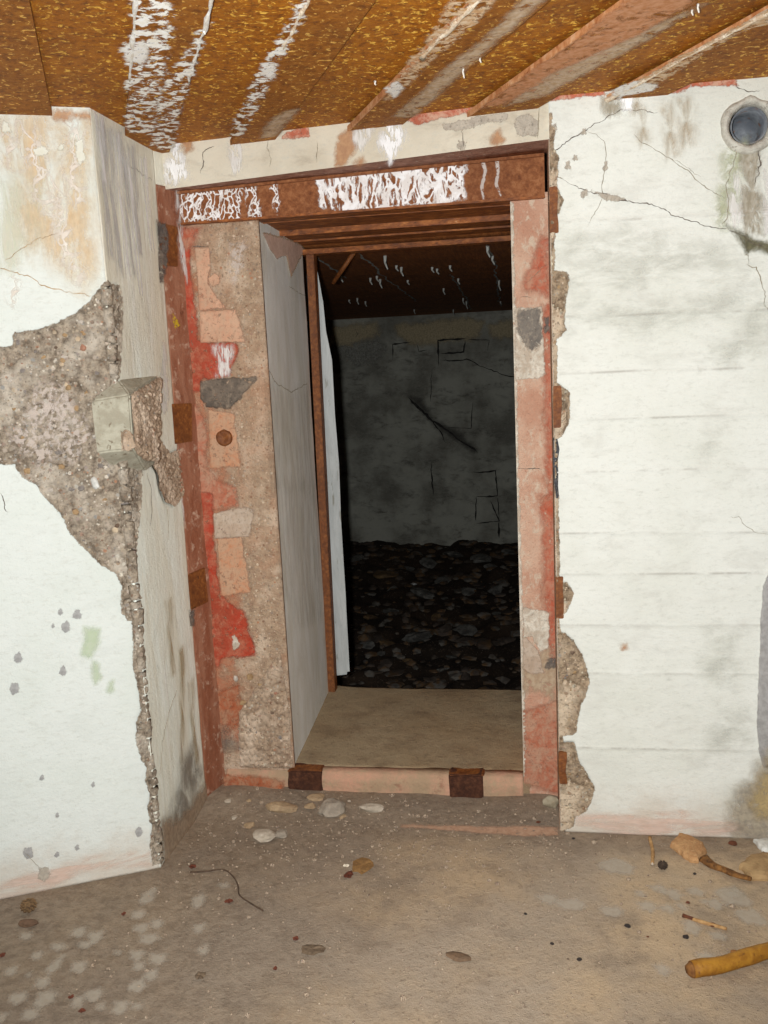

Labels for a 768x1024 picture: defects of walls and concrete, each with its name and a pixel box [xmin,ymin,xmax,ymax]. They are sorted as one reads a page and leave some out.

corrosion [54,111,91,120]
water stain [95,0,262,294]
water stain [229,0,310,174]
peeling [282,127,310,139]
corrosion [335,130,363,166]
crack [537,109,768,309]
water stain [729,152,768,253]
peeling [329,323,388,366]
crack [392,338,539,536]
peeling [396,0,739,846]
spalling [0,280,185,866]
corrosion [170,638,184,685]